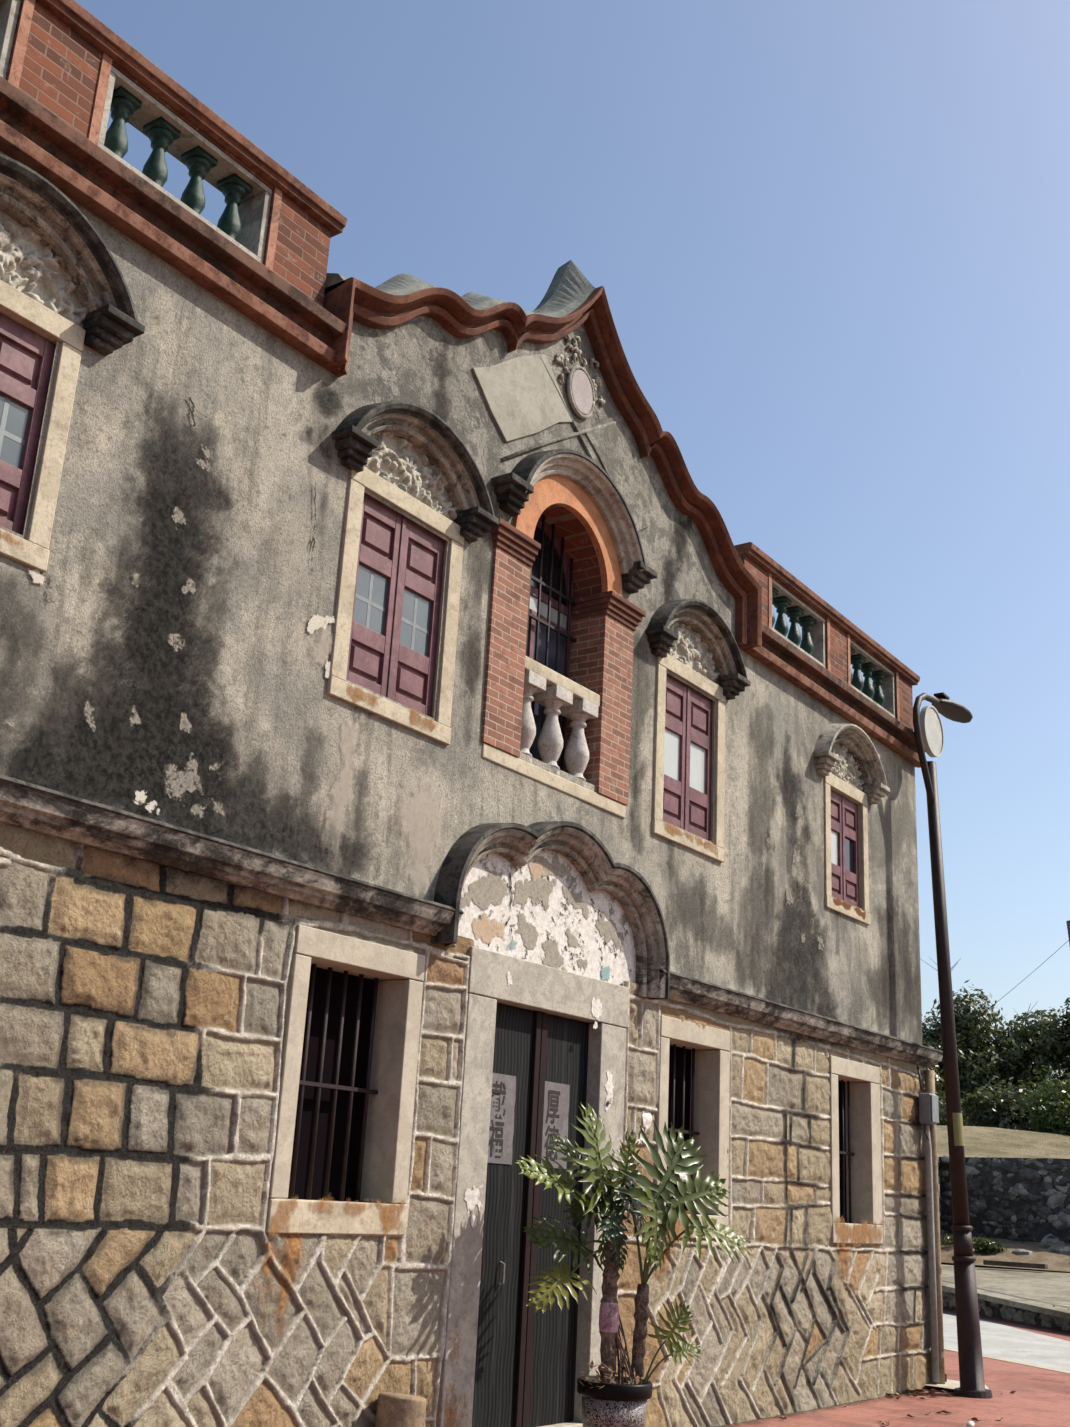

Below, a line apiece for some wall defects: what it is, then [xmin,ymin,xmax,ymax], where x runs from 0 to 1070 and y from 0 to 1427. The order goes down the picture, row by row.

flaking render [171,507,186,530]
leakage [0,382,381,875]
peeling [307,614,335,678]
flaking render [180,713,192,733]
flaking render [134,753,225,817]
leakage [833,731,879,786]
leakage [389,633,838,1019]
peeling [458,850,636,986]
leakage [868,889,922,1038]
peeling [591,997,602,1029]
corrosion [315,1198,404,1258]
corrosion [260,1199,302,1329]